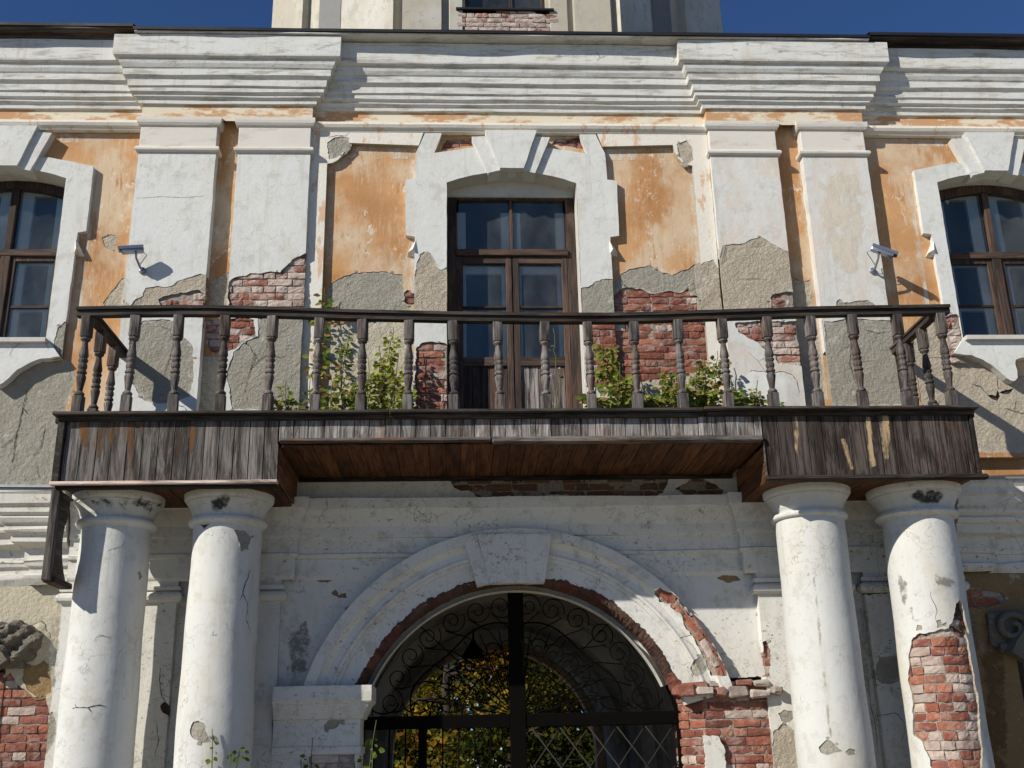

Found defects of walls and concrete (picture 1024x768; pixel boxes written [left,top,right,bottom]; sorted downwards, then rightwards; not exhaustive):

flaking render [103,254,307,411]
peeling [324,321,447,409]
peeling [402,252,447,311]
flaking render [586,235,824,408]
crack [11,391,45,478]
flaking render [450,468,723,497]
flaking render [0,660,52,768]
flaking render [354,579,798,768]
flaking render [908,588,1009,768]